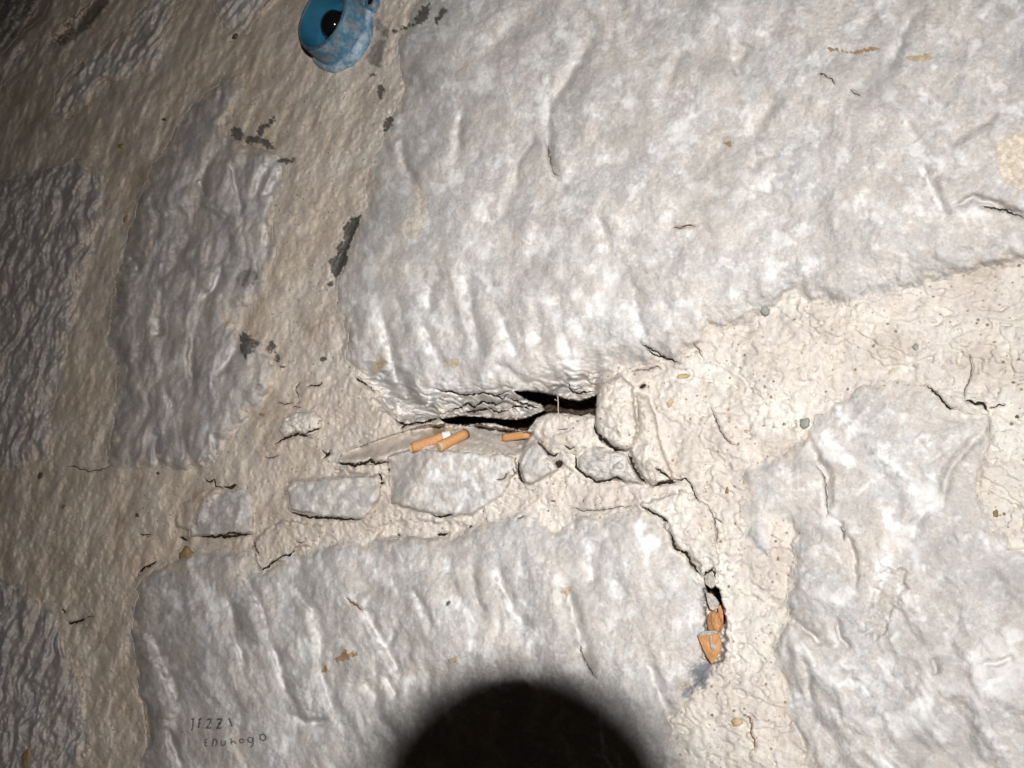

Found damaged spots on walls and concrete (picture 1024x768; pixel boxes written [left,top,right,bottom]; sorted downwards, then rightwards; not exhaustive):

crack [632,344,703,389]
crack [395,388,538,429]
spalling [441,392,597,431]
crack [710,406,735,445]
crack [496,462,524,483]
crack [538,424,722,579]
crack [433,513,472,536]
crack [579,644,597,679]